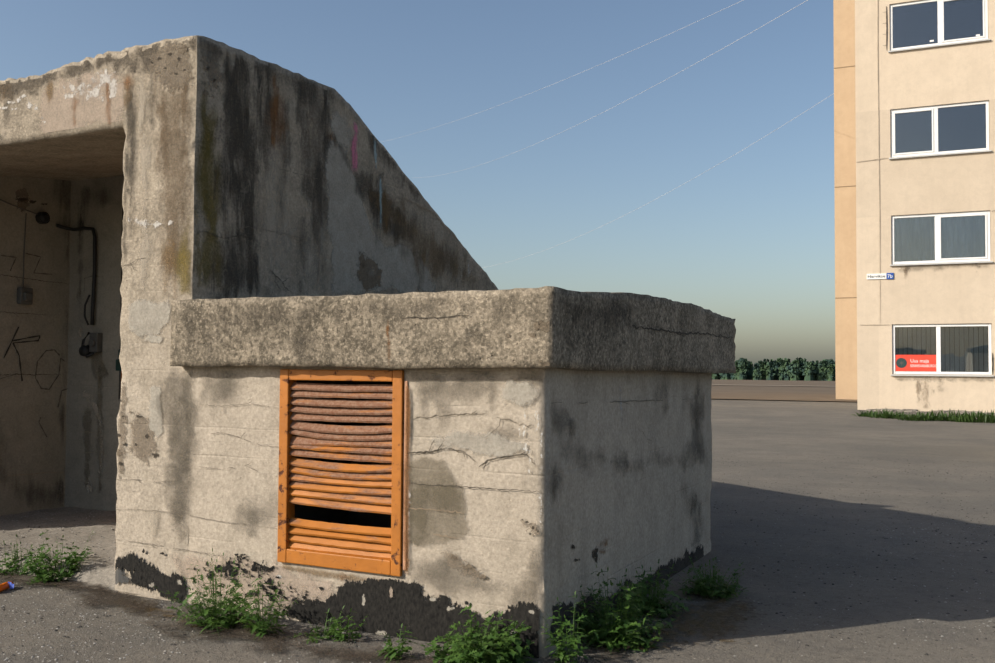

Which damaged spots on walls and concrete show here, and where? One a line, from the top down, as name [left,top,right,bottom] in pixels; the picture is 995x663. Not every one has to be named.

leakage [0,41,171,113]
leakage [123,83,187,282]
leakage [212,58,304,297]
leakage [297,81,340,240]
peeling [305,113,435,295]
peeling [115,544,704,658]